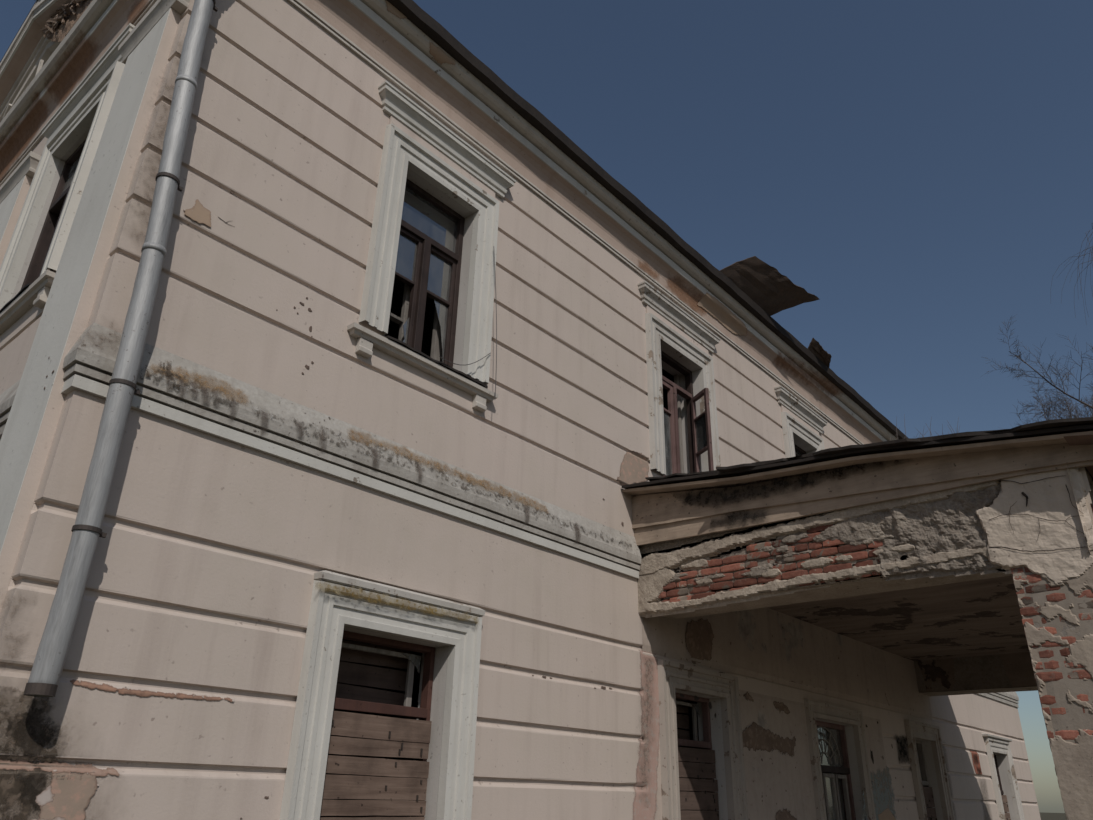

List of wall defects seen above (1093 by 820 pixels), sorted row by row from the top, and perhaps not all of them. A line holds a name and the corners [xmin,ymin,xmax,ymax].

peeling [183,199,211,227]
water stain [140,361,631,547]
mould [0,687,69,820]
peeling [0,759,120,820]
peeling [70,680,234,702]
flaking render [657,481,1093,820]